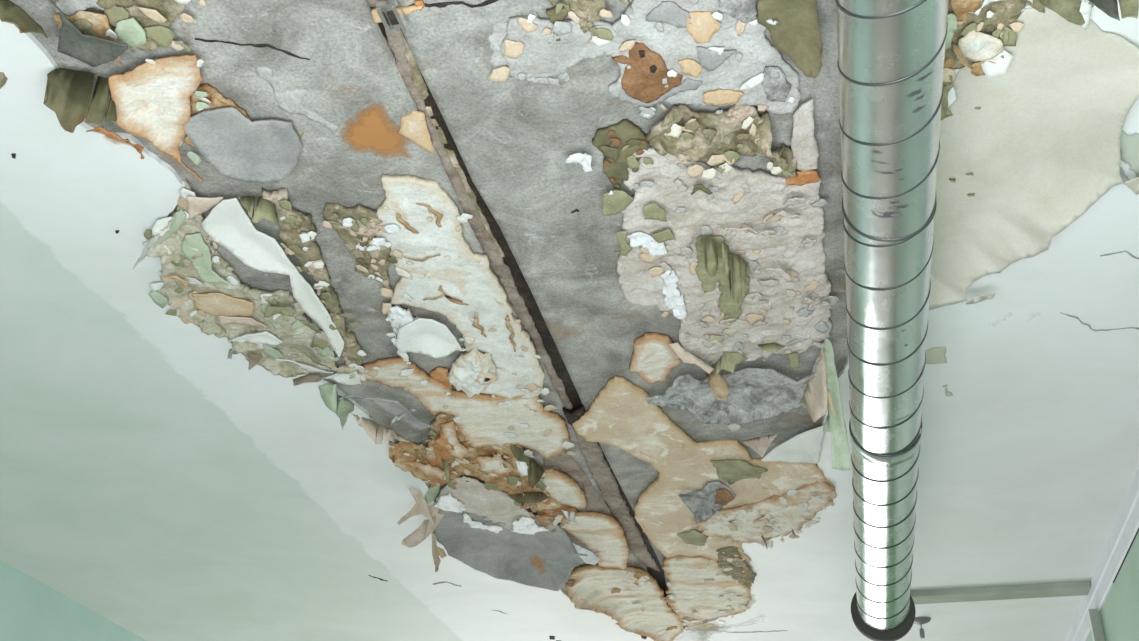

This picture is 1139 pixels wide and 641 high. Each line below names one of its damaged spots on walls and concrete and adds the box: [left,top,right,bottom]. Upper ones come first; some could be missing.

spalling [943,0,1139,91]
spalling [0,0,525,446]
spalling [396,0,848,458]
crack [1100,250,1139,259]
crack [1060,312,1139,331]
peeling [428,458,485,502]
spalling [507,358,613,593]
spalling [599,442,659,513]
spalling [678,481,837,586]
spalling [611,535,706,633]